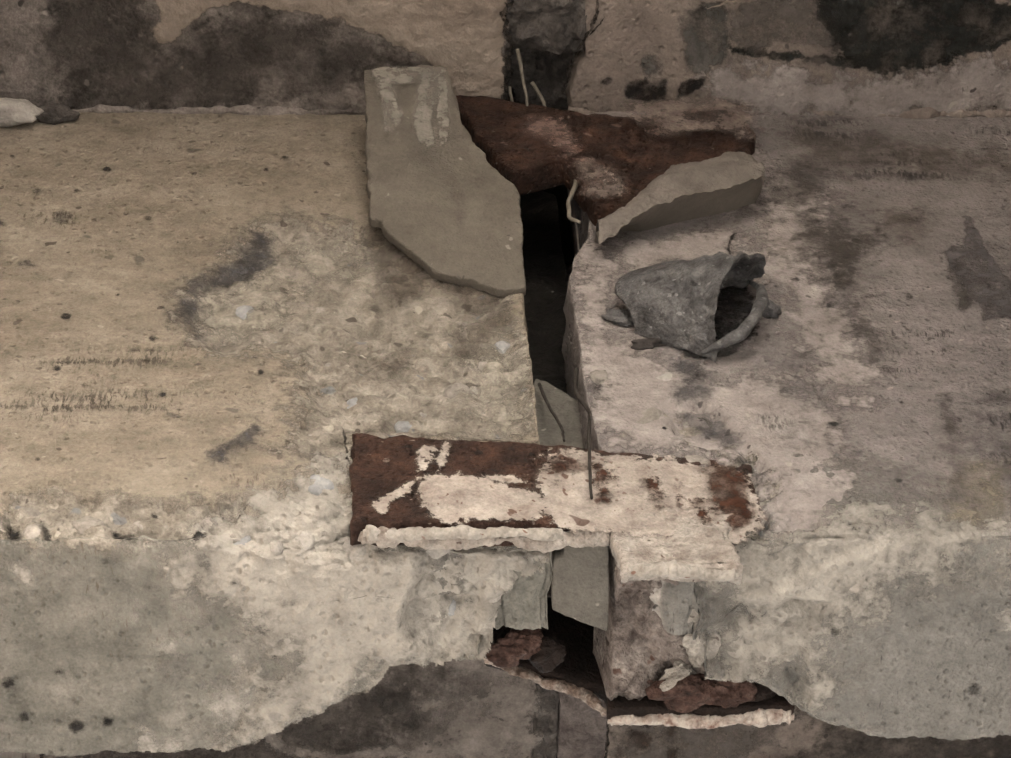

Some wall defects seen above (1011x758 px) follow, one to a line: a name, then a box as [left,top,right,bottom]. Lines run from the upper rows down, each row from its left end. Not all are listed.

water stain [729,46,880,69]
rust [521,116,605,190]
water stain [777,128,1011,285]
spalling [166,206,783,545]
rust [541,449,619,502]
rust [645,463,755,528]